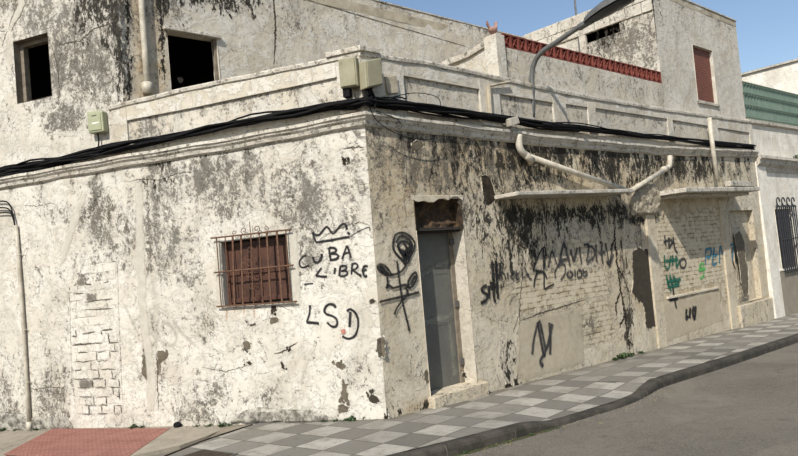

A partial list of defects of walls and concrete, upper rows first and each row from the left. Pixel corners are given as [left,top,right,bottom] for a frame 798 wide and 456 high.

leakage [151,0,263,80]
crack [271,0,279,61]
leakage [41,0,134,140]
leakage [562,149,662,186]
leakage [672,156,724,183]
leakage [483,164,645,294]
flaking render [67,262,127,415]
spalling [141,349,169,382]
spalling [270,305,280,325]
spalling [331,360,352,416]
spalling [366,389,390,419]
leakage [500,340,518,385]